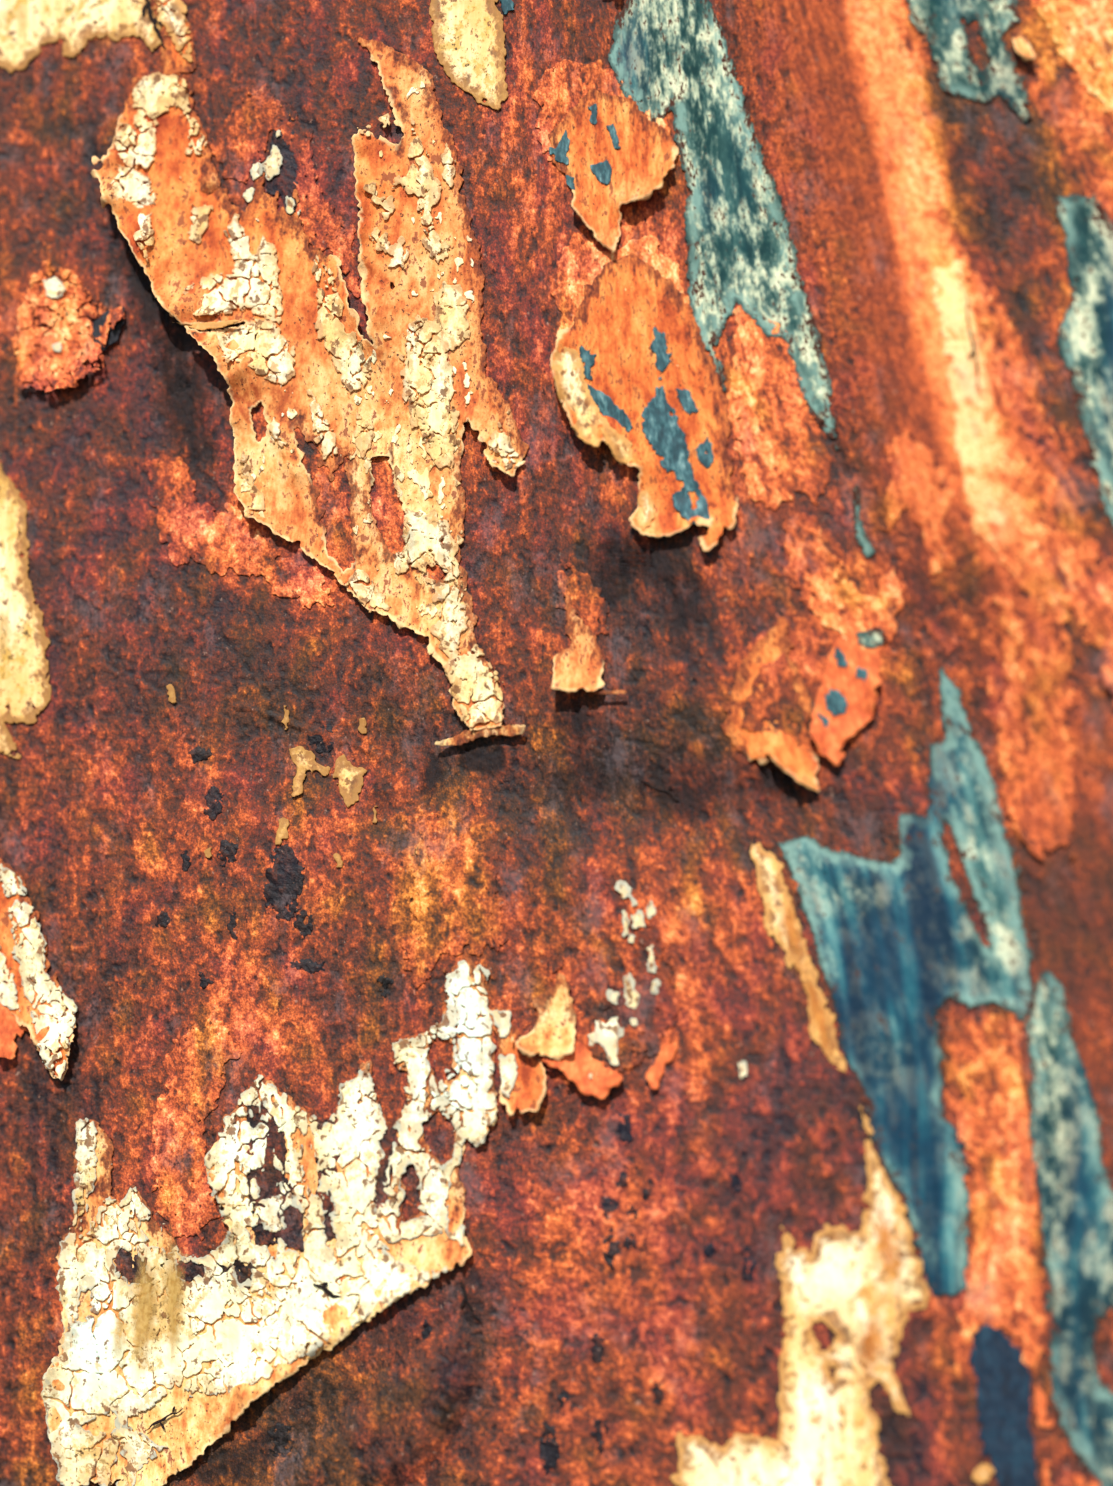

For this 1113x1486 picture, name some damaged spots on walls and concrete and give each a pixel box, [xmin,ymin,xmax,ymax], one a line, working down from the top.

rust [145,428,355,609]
peeling [0,0,529,760]
peeling [548,0,841,551]
rust [726,305,907,652]
rust [881,254,1113,860]
peeling [0,859,78,1081]
crack [145,1406,183,1431]
crack [313,1282,341,1298]
peeling [41,880,680,1486]
crack [460,1279,483,1325]
peeling [669,667,1113,1486]
rust [943,1005,1046,1369]